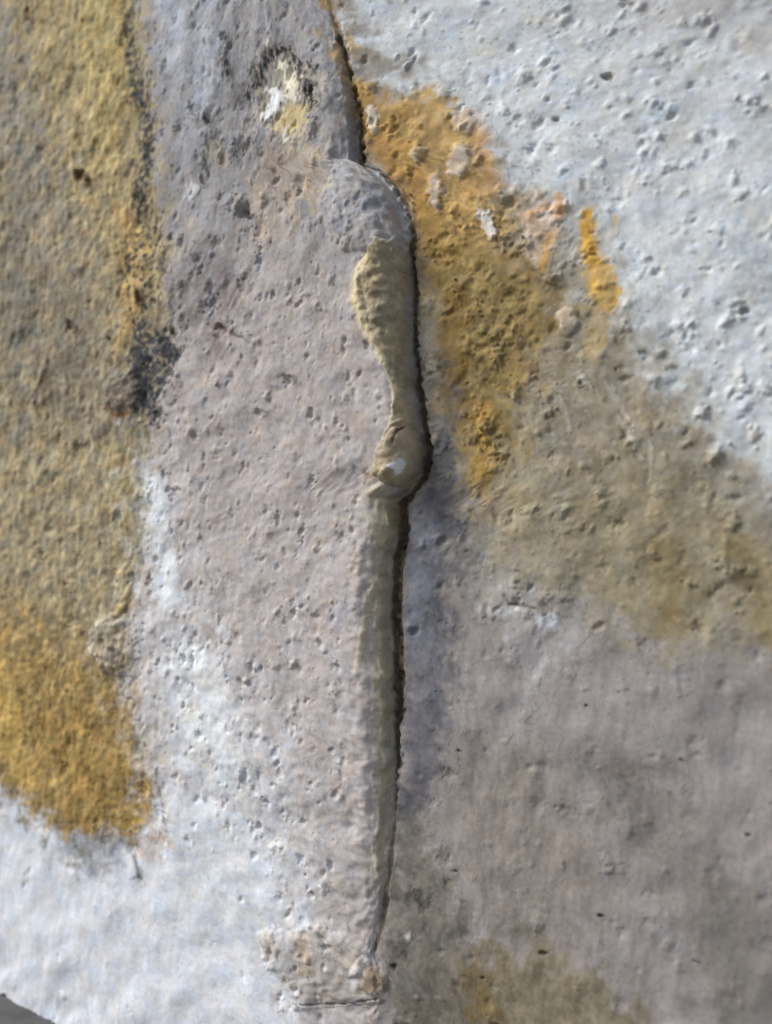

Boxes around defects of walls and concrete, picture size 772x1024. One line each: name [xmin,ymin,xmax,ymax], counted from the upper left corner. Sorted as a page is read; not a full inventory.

water stain [0,0,363,1013]
crack [328,0,453,954]
rust [312,0,626,524]
water stain [519,176,604,302]
water stain [372,227,772,1024]